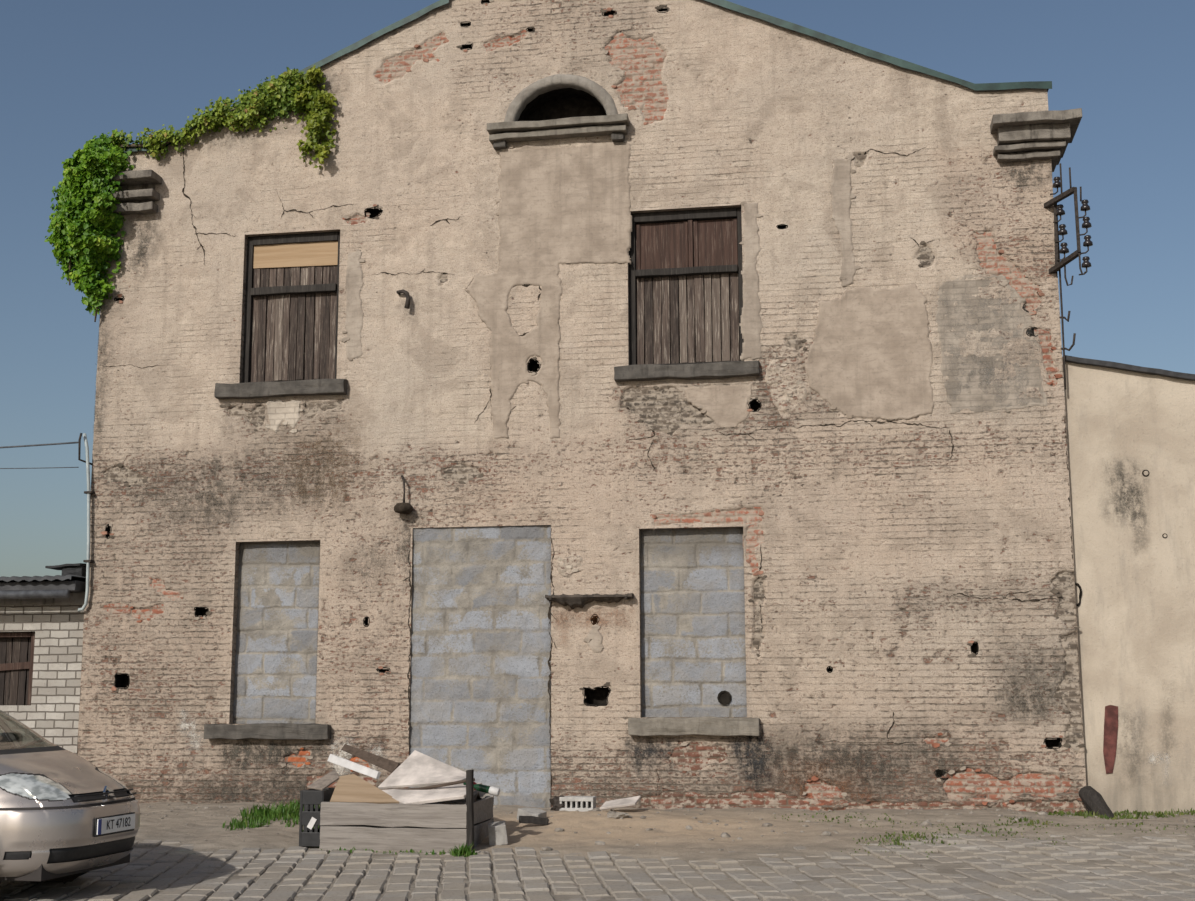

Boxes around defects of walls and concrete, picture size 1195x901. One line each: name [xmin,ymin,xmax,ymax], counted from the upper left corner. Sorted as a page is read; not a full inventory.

spalling [600,7,617,18]
spalling [374,21,535,84]
spalling [603,32,669,125]
crack [851,146,927,161]
crack [182,151,235,263]
crack [277,192,354,220]
flaking render [936,231,1062,414]
flaking render [220,399,344,433]
spalling [620,383,762,436]
spalling [281,747,377,790]
spalling [667,742,731,776]
spalling [641,766,1084,813]